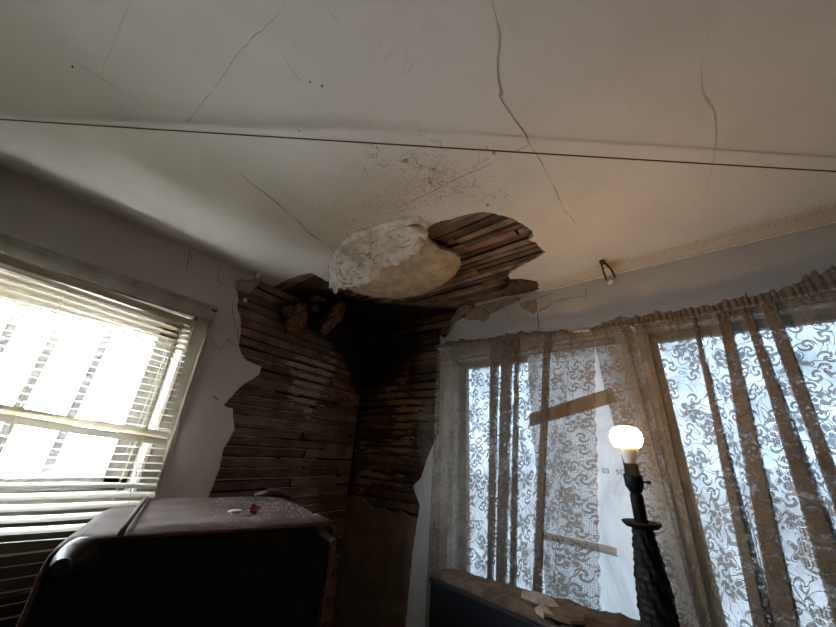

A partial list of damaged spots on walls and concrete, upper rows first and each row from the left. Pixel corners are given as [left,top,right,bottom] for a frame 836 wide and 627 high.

crack [182,1,286,130]
crack [238,172,334,251]
crack [490,0,576,224]
crack [701,1,717,203]
spalling [208,140,542,627]